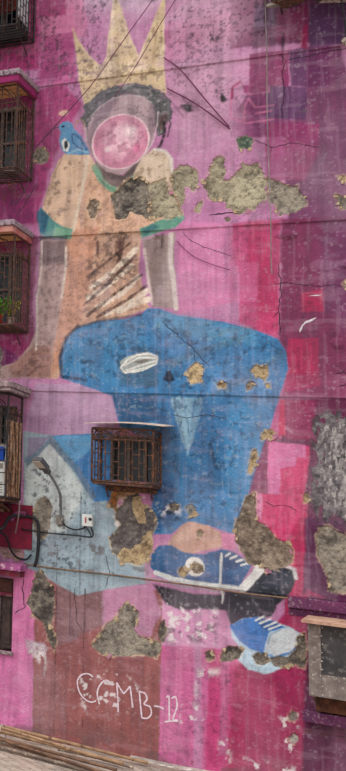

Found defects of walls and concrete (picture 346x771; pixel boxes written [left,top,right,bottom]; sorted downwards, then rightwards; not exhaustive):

flaking render [87,198,101,218]
flaking render [111,156,307,222]
crack [270,265,342,335]
flaking render [183,363,204,385]
flaking render [246,363,270,390]
flaking render [106,491,158,566]
flaking render [232,493,293,575]
flaking render [317,526,346,593]
flaking render [27,569,57,649]
flaking render [91,601,167,659]
flaking render [206,646,245,662]
flaking render [253,633,308,670]